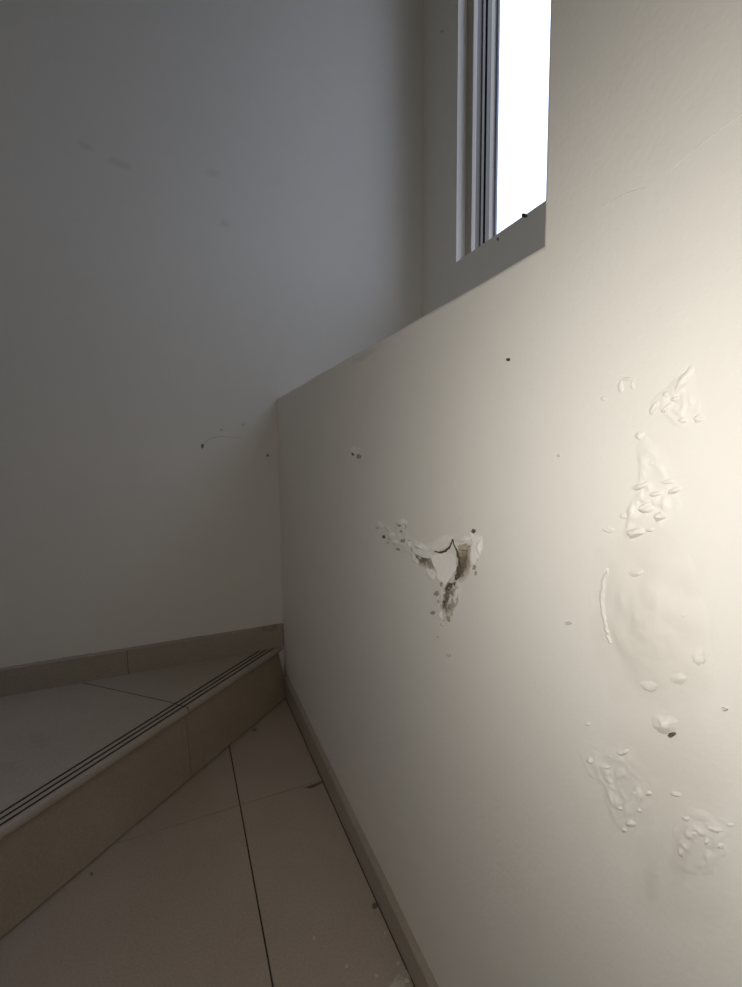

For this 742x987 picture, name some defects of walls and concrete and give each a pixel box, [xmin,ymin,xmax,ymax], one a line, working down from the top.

peeling [376,517,483,638]